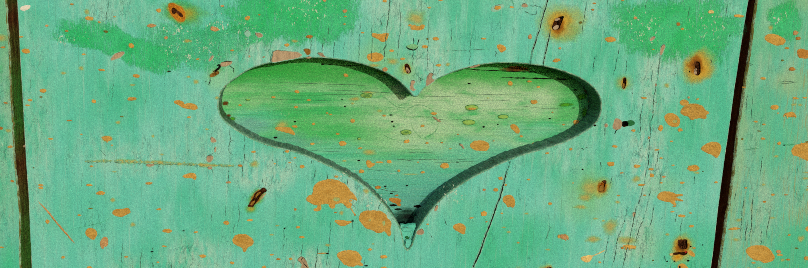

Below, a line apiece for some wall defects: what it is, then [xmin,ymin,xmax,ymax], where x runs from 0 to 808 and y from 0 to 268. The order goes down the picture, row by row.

corrosion [168,3,199,22]
corrosion [544,9,582,40]
corrosion [684,53,713,82]
corrosion [246,188,267,212]
corrosion [583,180,610,196]
crack [472,162,511,268]
corrosion [669,236,692,261]